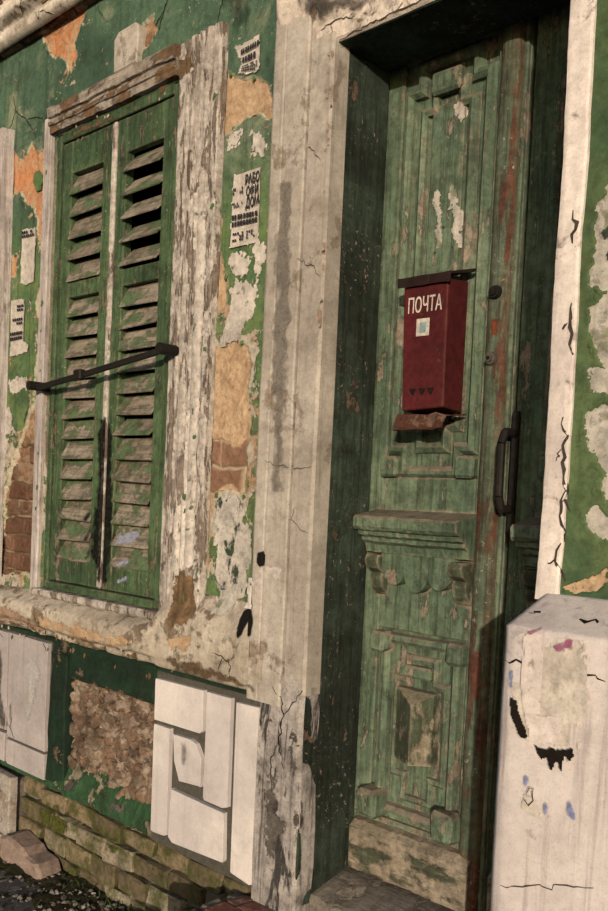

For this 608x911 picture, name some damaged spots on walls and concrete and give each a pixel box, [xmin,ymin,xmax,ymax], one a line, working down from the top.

flaking render [43,10,87,73]
flaking render [213,70,273,157]
peeling [13,145,47,250]
peeling [579,184,608,540]
flaking render [162,185,281,657]
flaking render [2,376,39,575]
flaking render [563,568,608,594]
crack [270,688,303,792]
spalling [510,698,527,739]
spalling [535,746,574,771]
crack [501,883,583,891]